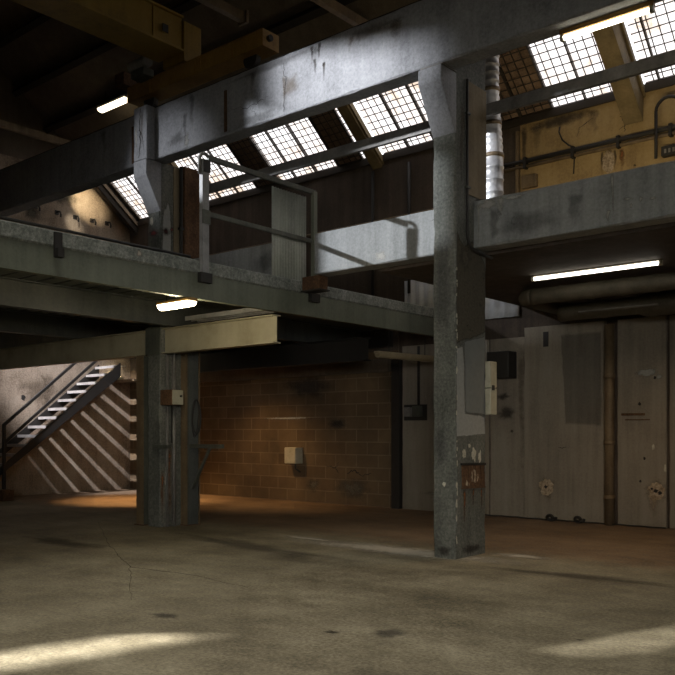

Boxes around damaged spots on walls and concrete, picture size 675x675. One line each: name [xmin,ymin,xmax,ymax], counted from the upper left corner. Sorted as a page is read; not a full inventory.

peeling [456,232,486,522]